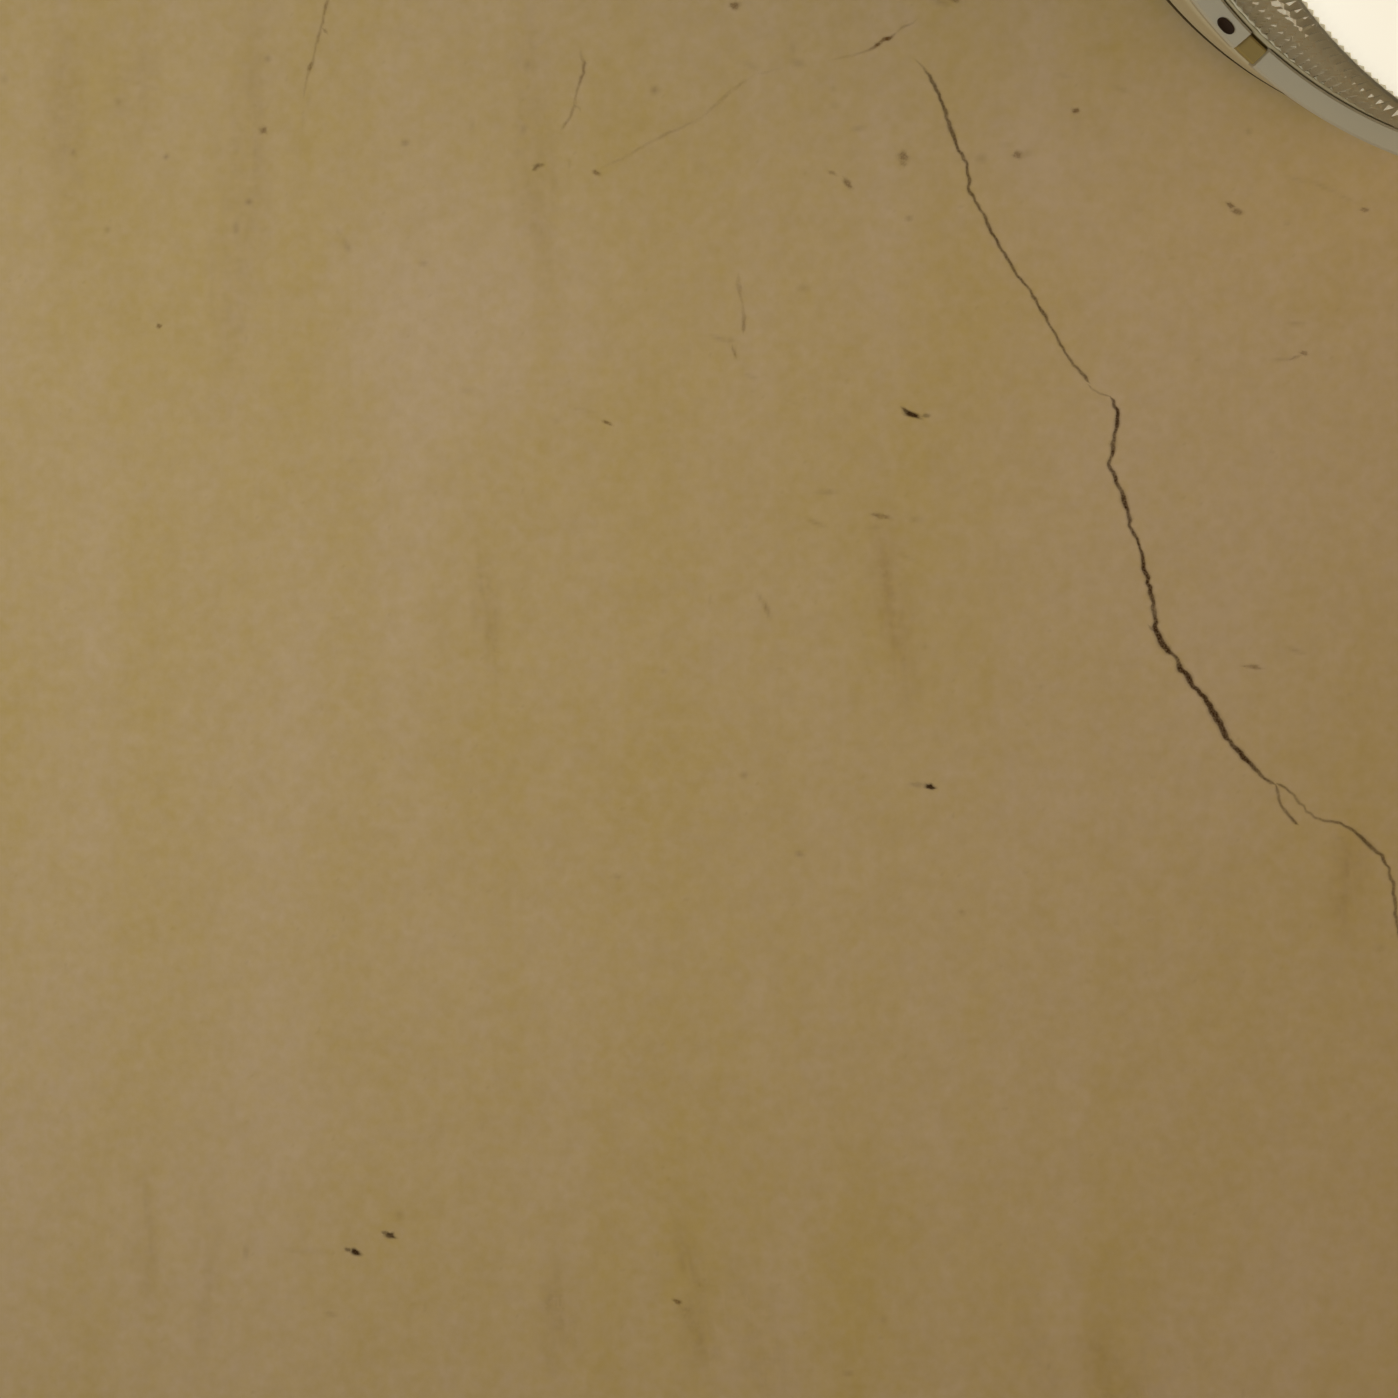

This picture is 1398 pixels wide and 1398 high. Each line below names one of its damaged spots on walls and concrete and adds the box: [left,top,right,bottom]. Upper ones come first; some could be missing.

crack [1108,400,1265,779]